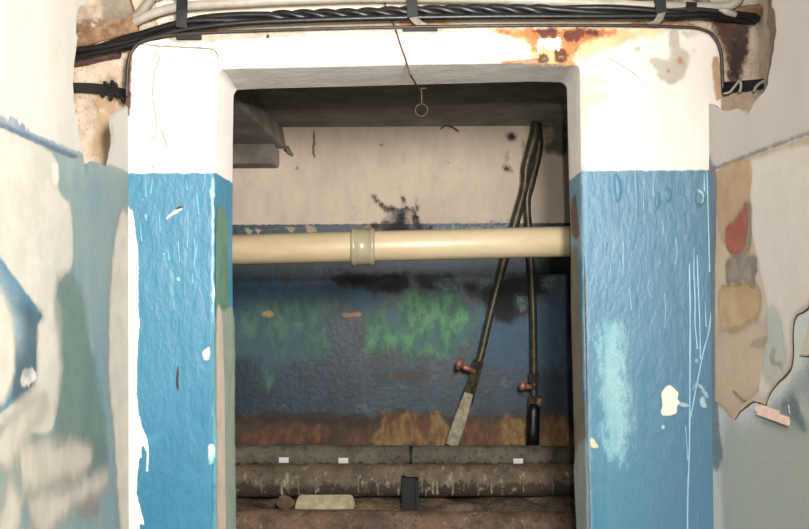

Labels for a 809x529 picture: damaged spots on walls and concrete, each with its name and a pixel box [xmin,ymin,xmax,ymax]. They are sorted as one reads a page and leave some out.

spalling [76,0,143,32]
spalling [92,2,174,45]
corrosion [489,19,694,68]
spalling [683,19,760,82]
spalling [73,48,132,166]
crack [140,44,219,147]
spalling [721,89,761,113]
flaking render [714,137,809,435]